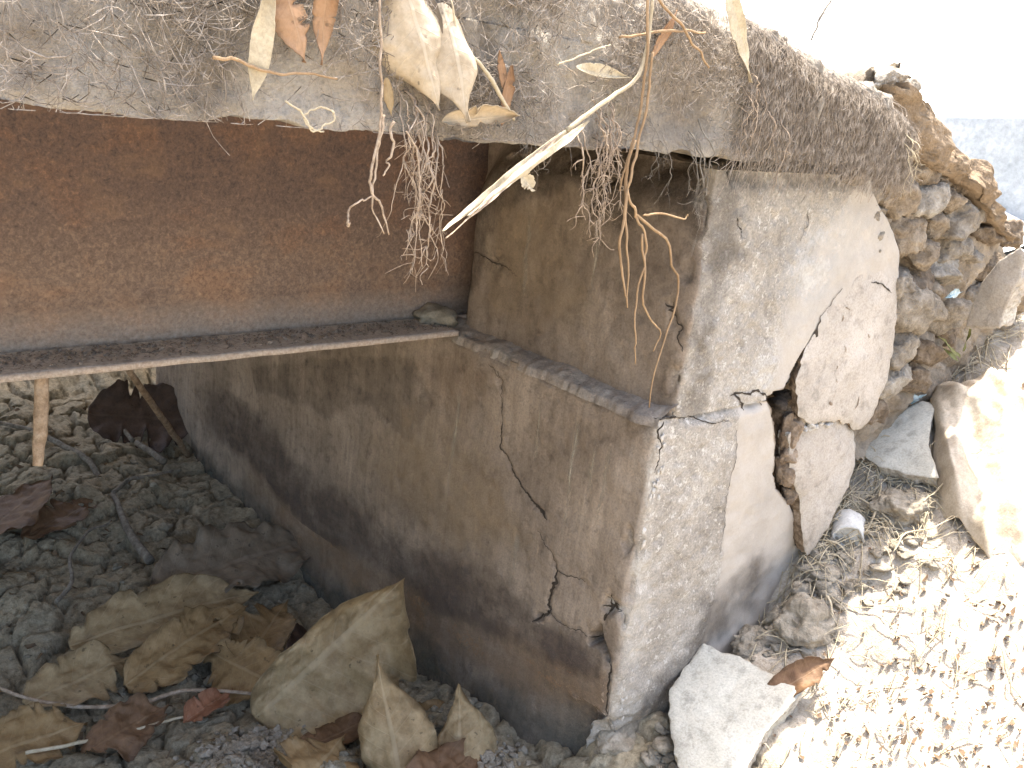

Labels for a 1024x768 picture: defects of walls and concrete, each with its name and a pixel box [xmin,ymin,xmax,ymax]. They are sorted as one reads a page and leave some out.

leakage [222,398,504,635]
crack [489,365,598,638]
crack [654,288,843,553]
peeling [777,420,856,556]
leakage [412,643,456,690]
leakage [470,687,504,720]
leakage [537,729,590,756]